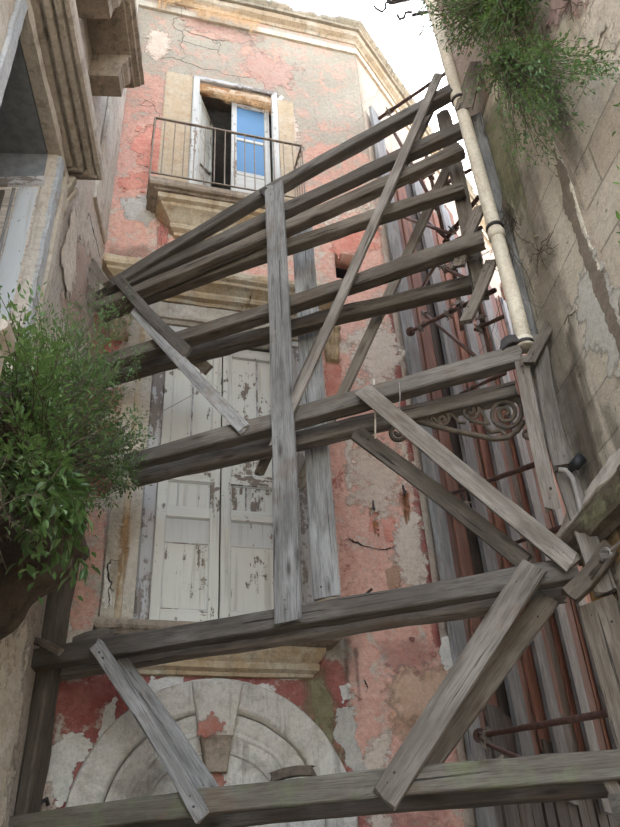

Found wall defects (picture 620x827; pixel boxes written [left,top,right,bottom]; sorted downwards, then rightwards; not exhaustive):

peeling [145,29,172,62]
crack [160,1,246,80]
peeling [117,125,167,228]
peeling [324,320,370,397]
peeling [355,318,405,385]
crack [341,538,395,550]
peeling [344,439,429,590]
peeling [148,676,184,692]
peeling [438,636,453,671]
peeling [41,697,118,811]
peeling [333,683,393,771]
peeling [366,814,394,827]